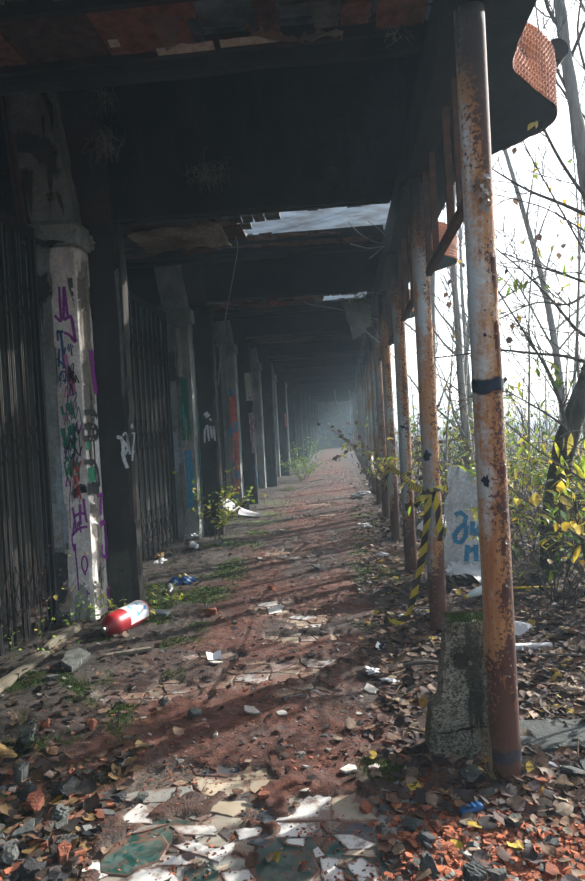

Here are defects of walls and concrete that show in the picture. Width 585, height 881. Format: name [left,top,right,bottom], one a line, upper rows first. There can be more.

corrosion [491,254,500,303]
corrosion [494,318,504,414]
peeling [339,764,357,774]